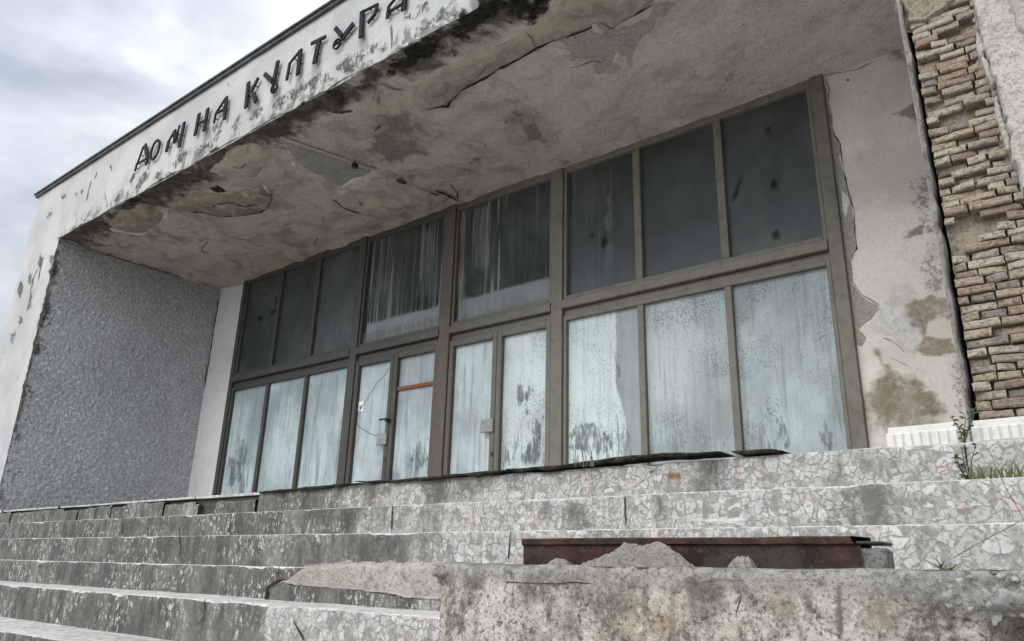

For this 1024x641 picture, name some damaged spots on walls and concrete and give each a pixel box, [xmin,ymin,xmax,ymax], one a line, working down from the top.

water stain [205,0,551,145]
crack [425,3,655,111]
flaking render [286,142,370,185]
flaking render [824,86,879,346]
flaking render [894,0,1024,420]
spalling [11,242,59,433]
water stain [865,351,939,427]
water stain [870,285,963,406]